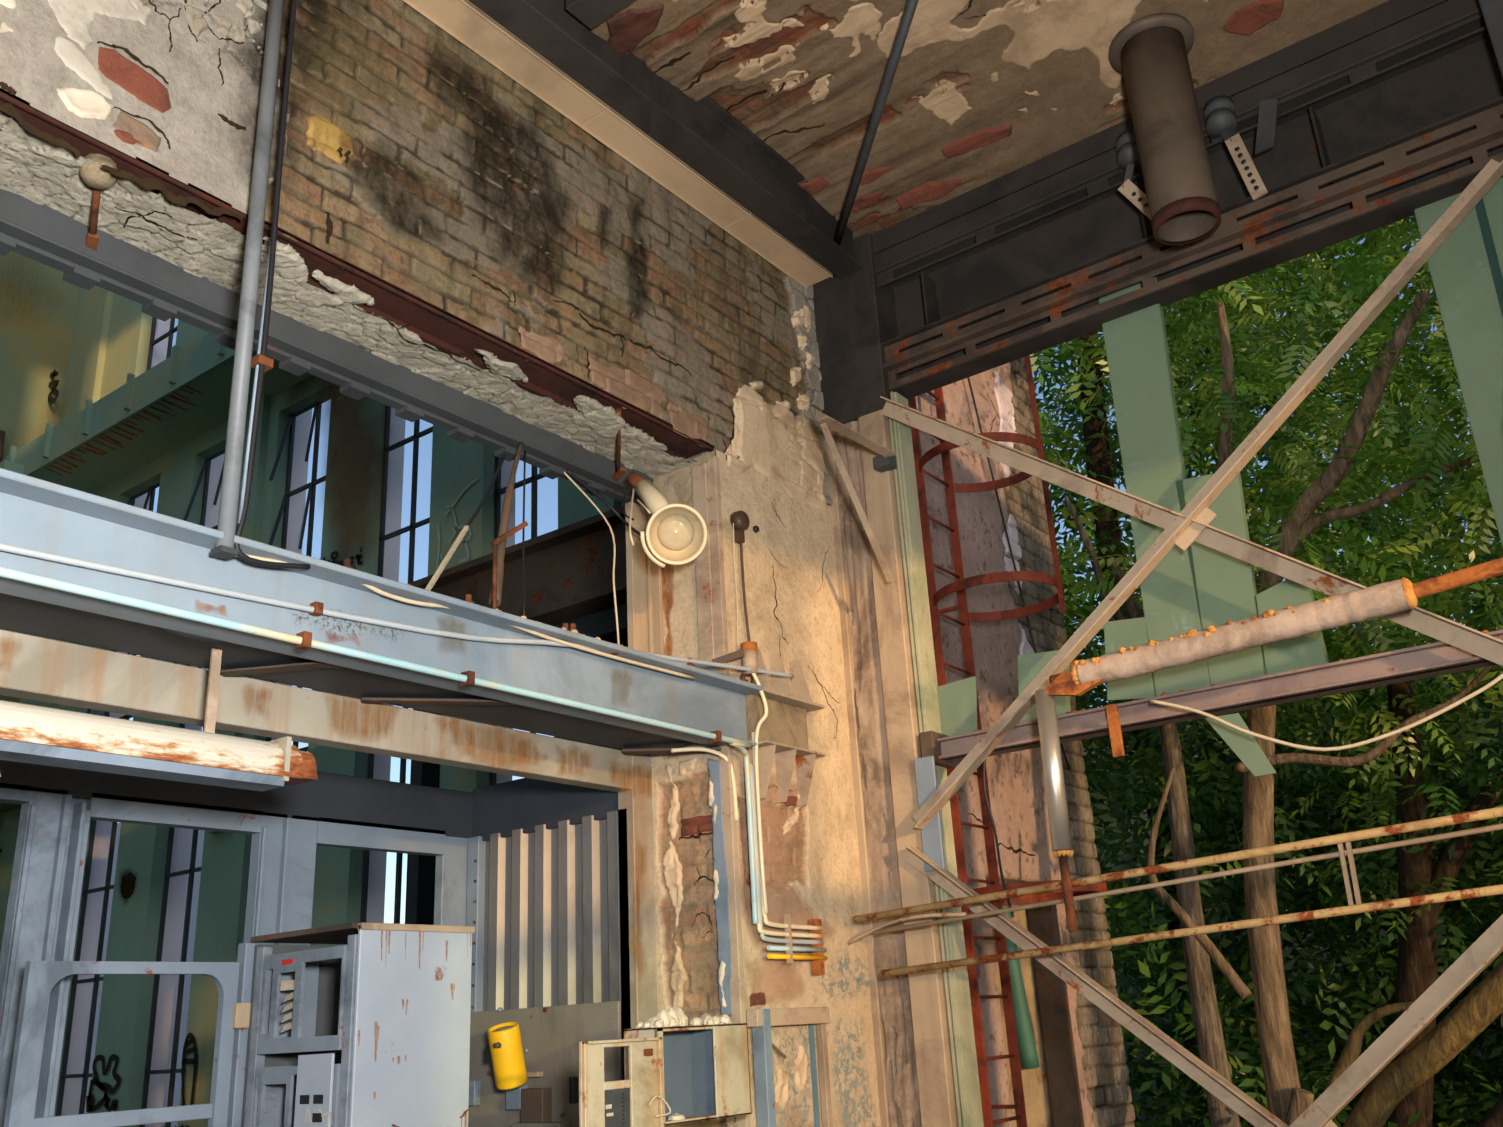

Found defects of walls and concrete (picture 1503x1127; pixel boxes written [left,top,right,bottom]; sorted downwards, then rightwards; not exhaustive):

peeling [48,0,171,152]
crack [148,0,248,130]
peeling [722,0,1142,109]
crack [0,82,243,240]
mould [352,152,437,236]
mould [432,59,567,285]
water stain [628,205,648,319]
corrosion [1151,196,1221,246]
flaking render [475,326,570,383]
flaking render [574,355,708,453]
spalling [725,305,827,514]
peeling [663,756,751,1017]